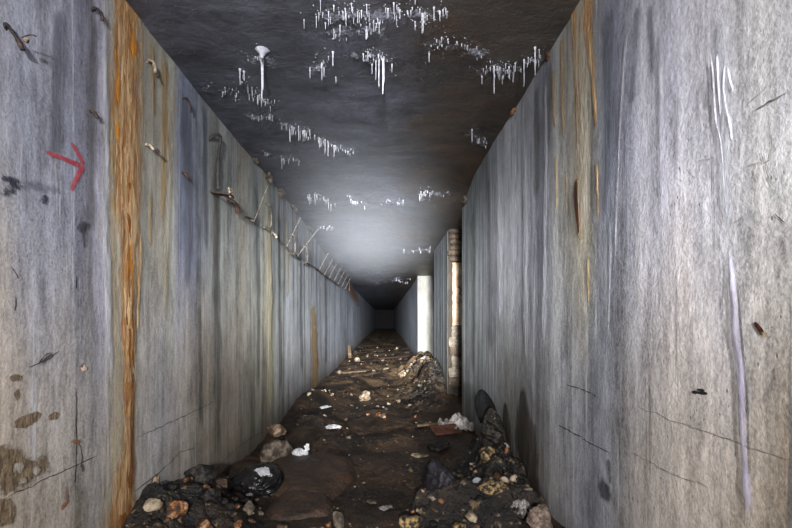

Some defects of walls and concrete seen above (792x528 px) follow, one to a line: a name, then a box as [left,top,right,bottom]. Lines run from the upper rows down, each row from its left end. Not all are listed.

leakage [206,43,354,154]
leakage [313,0,448,42]
leakage [425,36,544,81]
rust [553,0,598,229]
rust [106,0,175,528]
flaking render [0,445,49,526]
flaking render [14,412,59,428]
crack [4,396,93,499]
crack [641,408,787,460]